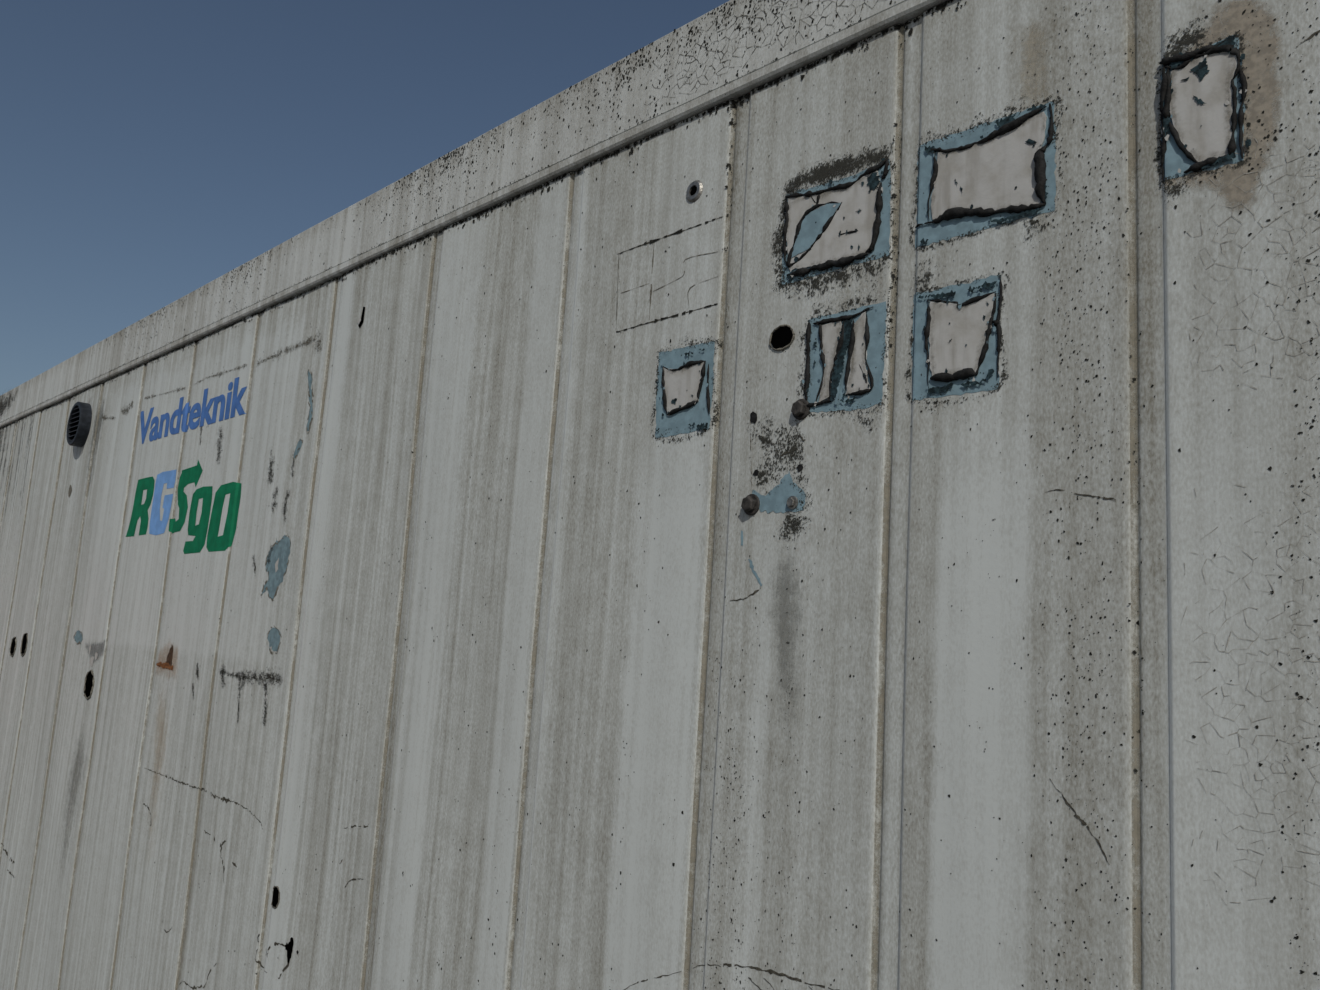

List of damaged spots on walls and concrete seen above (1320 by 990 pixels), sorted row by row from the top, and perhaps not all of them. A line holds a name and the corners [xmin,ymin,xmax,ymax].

crack [645,0,878,111]
peeling [1153,30,1251,185]
peeling [777,96,1064,285]
peeling [650,338,723,444]
peeling [802,271,1011,417]
water stain [734,0,1320,856]
peeling [253,450,291,601]
rust [156,645,173,670]
crack [145,768,263,829]
crack [204,830,237,881]
crack [624,963,839,990]
water stain [1022,838,1151,990]